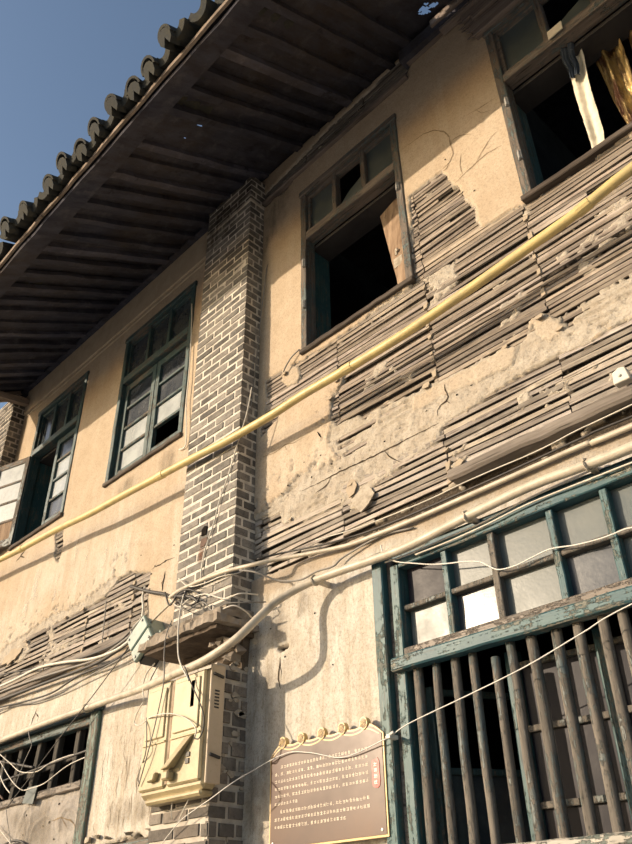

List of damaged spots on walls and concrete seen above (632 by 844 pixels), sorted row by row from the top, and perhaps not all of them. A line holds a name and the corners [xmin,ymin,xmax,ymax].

crack [404,130,502,183]
flaking render [251,131,632,586]
crack [302,385,449,492]
flaking render [52,529,66,566]
flaking render [0,563,155,691]
flaking render [84,821,151,844]